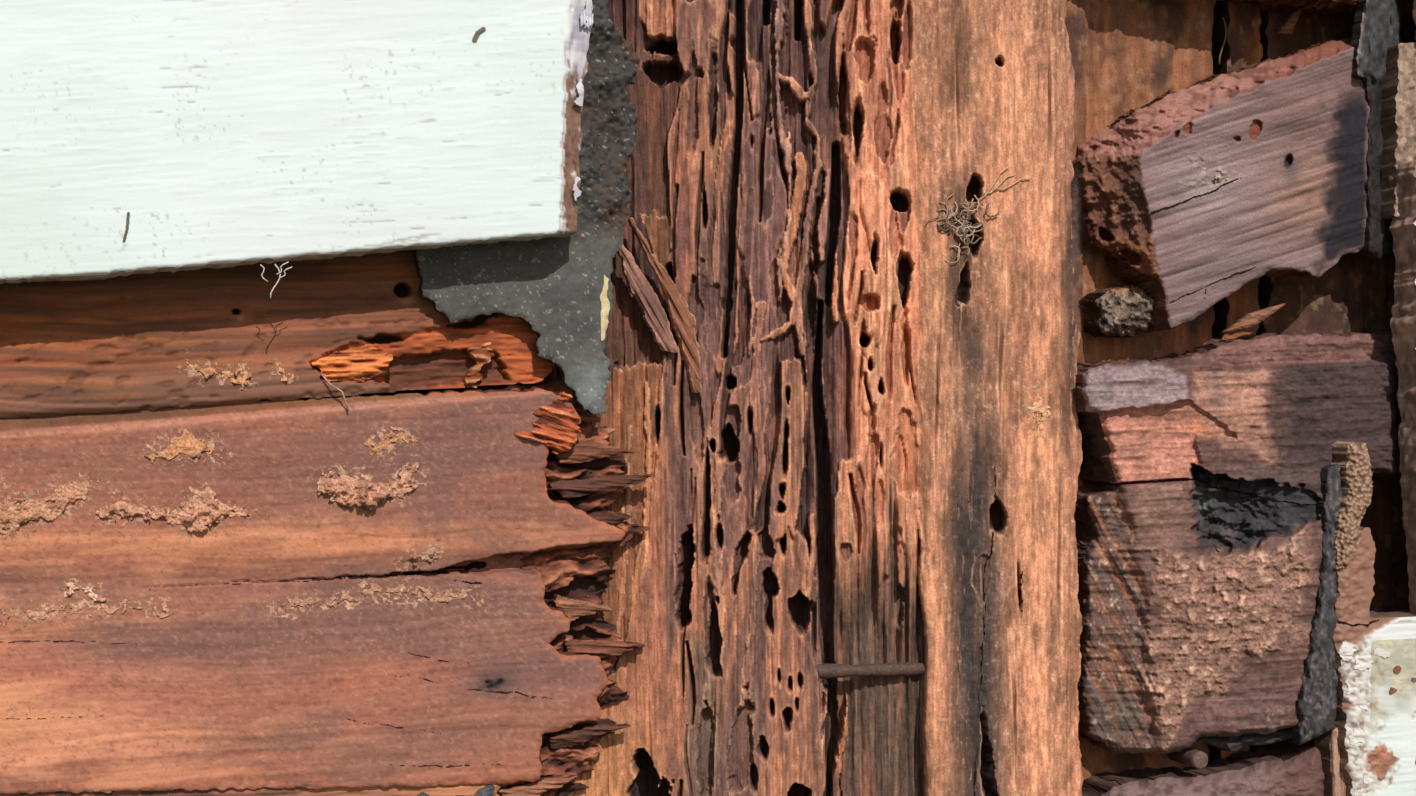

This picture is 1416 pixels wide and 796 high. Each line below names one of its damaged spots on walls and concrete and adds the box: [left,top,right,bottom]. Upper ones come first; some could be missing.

crack [149,561,495,590]
corrosion [1389,665,1416,694]
corrosion [1367,745,1398,780]